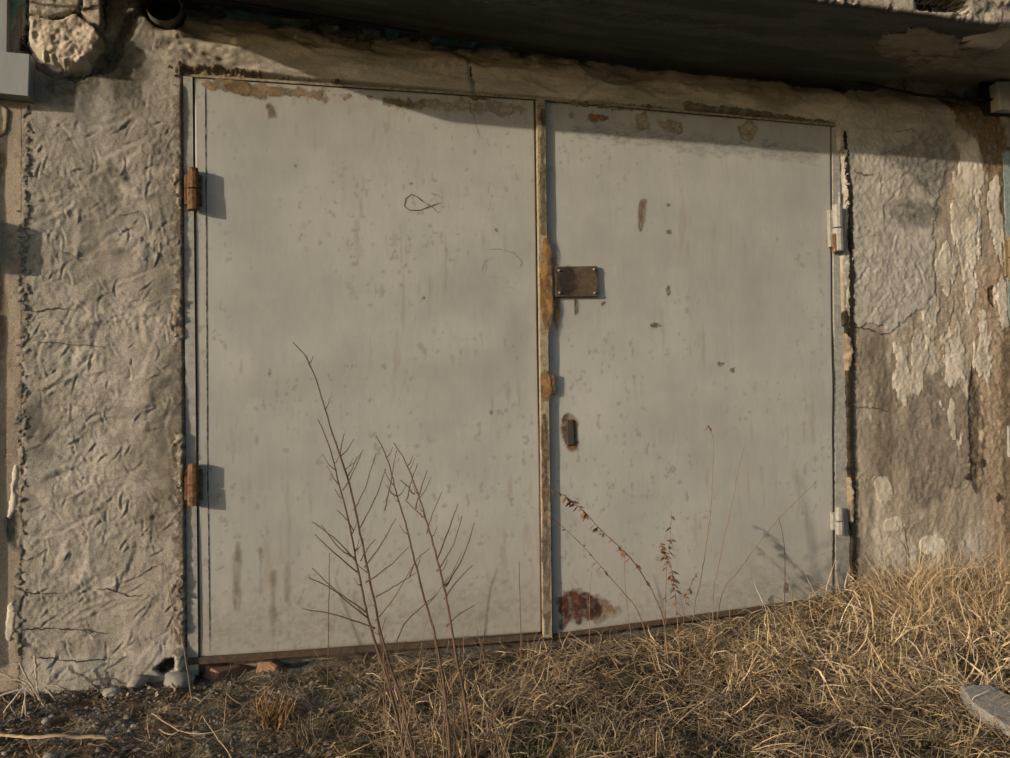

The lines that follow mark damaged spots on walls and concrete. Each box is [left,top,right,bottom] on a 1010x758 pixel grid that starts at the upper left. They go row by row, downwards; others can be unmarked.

spalling [10,0,110,96]
flaking render [871,26,1010,55]
spalling [914,0,1010,15]
corrosion [539,109,560,333]
corrosion [638,199,646,231]
crack [38,341,109,349]
spalling [167,61,339,659]
crack [841,128,917,587]
peeling [890,134,1010,544]
corrosion [540,414,615,635]
crack [95,560,165,597]
crack [26,627,113,663]